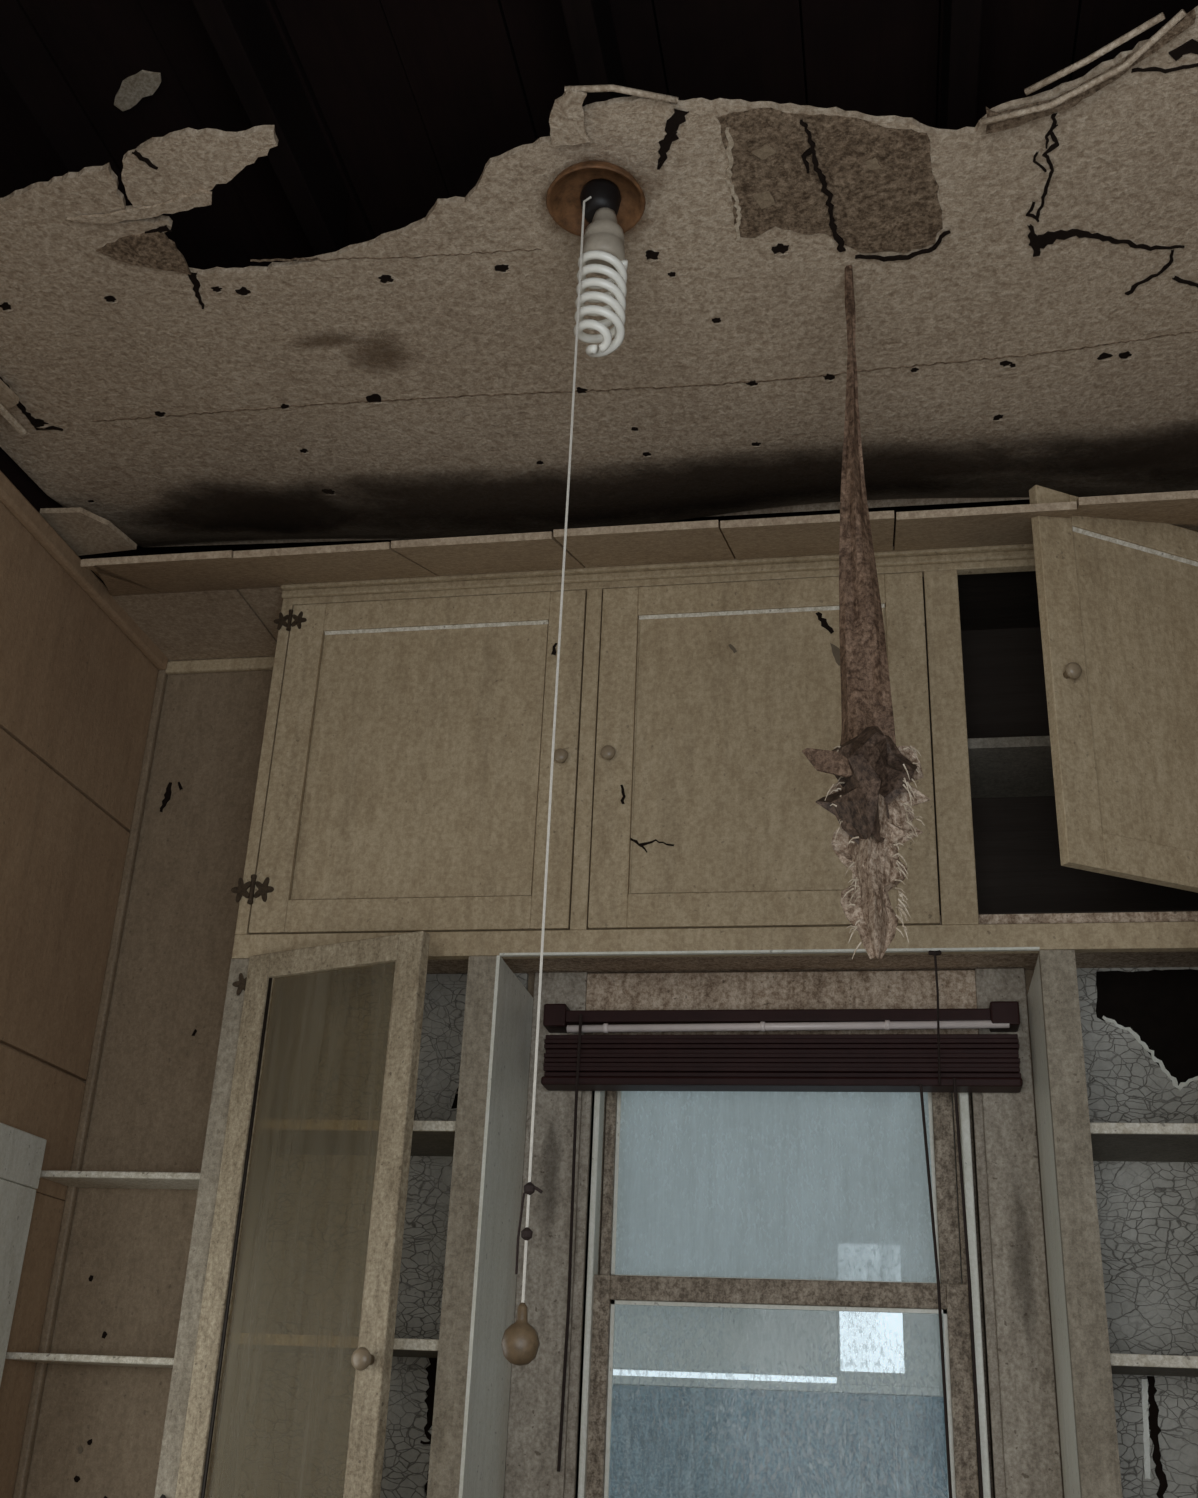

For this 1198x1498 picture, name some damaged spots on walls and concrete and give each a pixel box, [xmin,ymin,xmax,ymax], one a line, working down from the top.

crack [1131,39,1198,74]
crack [132,150,158,170]
crack [657,109,689,170]
crack [800,119,846,252]
peeling [717,108,951,262]
crack [1026,113,1198,295]
crack [0,330,1198,431]
leakage [153,453,842,533]
leakage [862,426,1198,493]
crack [420,1358,437,1496]
crack [1141,1376,1168,1498]